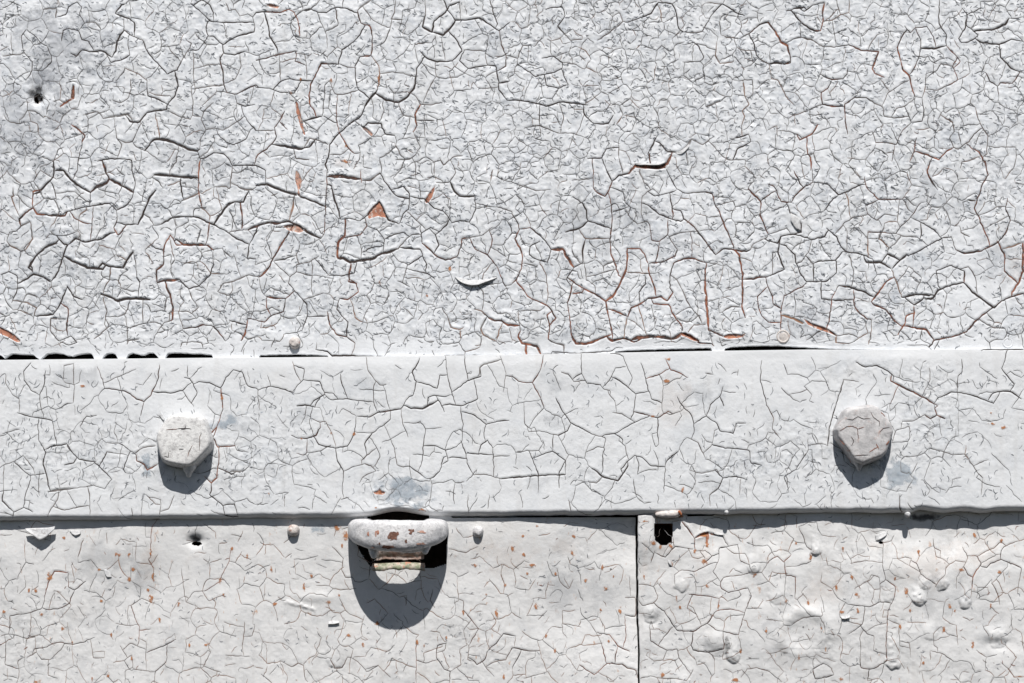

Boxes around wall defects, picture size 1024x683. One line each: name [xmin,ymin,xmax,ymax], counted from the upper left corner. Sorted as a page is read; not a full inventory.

peeling [368,202,386,219]
peeling [455,277,497,286]
crack [0,0,1024,536]
crack [0,512,1024,683]